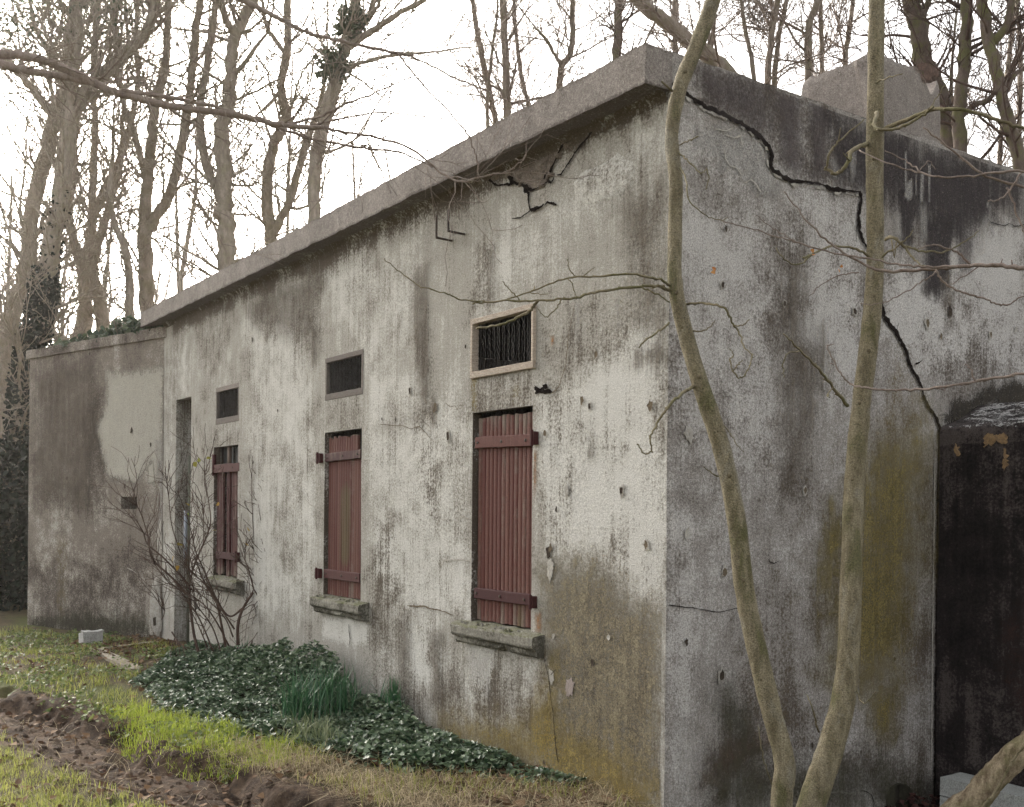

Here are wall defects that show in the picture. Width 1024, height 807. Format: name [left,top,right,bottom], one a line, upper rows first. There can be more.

crack [488,131,593,219]
crack [672,82,867,248]
leakage [884,131,1023,323]
leakage [414,265,435,424]
peeling [949,402,1024,470]
leakage [536,546,662,805]
crack [669,604,737,612]
crack [882,302,941,802]